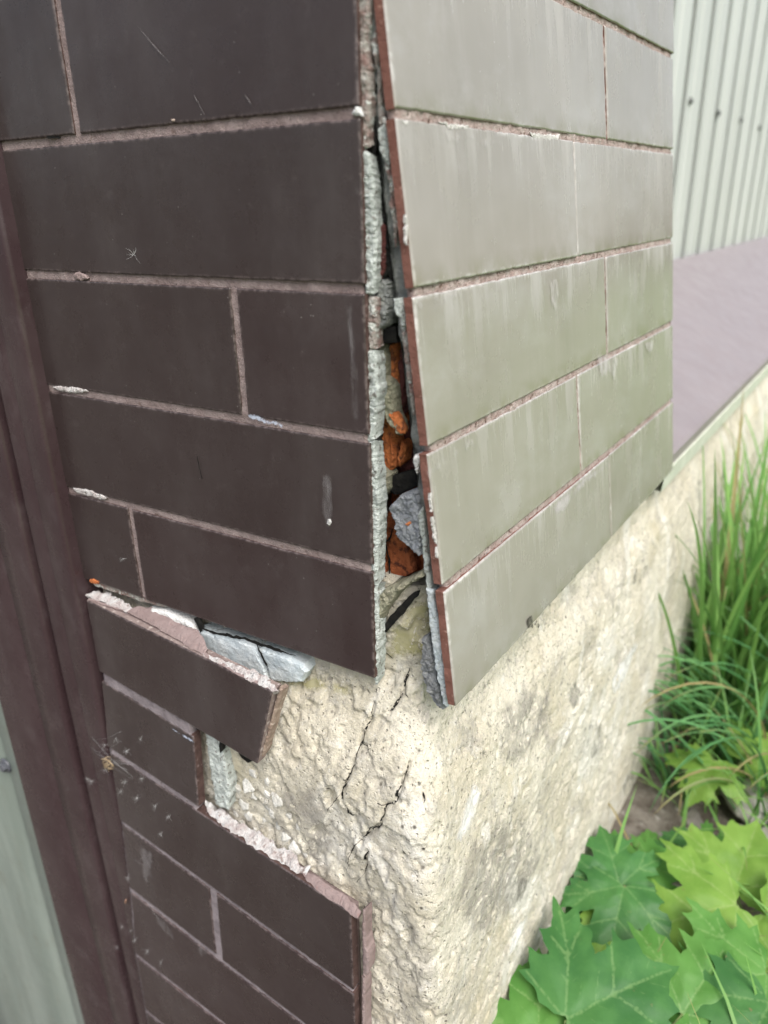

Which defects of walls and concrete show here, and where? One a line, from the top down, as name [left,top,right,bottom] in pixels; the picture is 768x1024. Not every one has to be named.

crack [370,56,394,283]
crack [383,325,401,343]
crack [390,468,417,495]
peeling [428,493,439,558]
crack [327,590,426,886]
flaking render [229,769,308,859]